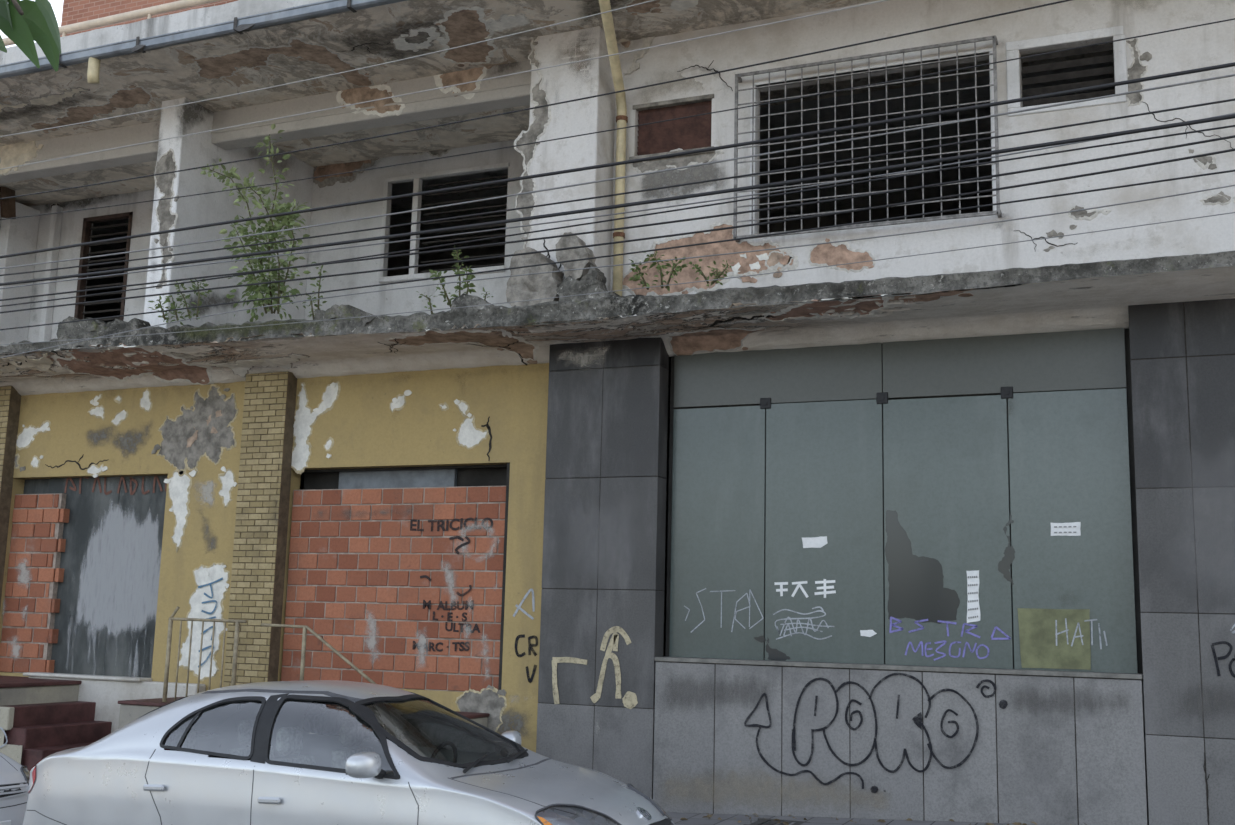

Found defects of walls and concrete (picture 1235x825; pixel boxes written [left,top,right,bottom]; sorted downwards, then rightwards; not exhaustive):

peeling [183,37,405,117]
spalling [1126,38,1152,107]
peeling [391,6,552,249]
crack [1143,102,1233,149]
peeling [154,148,179,289]
spalling [622,220,876,296]
crack [1016,230,1077,252]
crack [45,454,109,470]
spalling [0,343,310,553]
peeling [291,381,341,474]
crack [481,416,492,461]